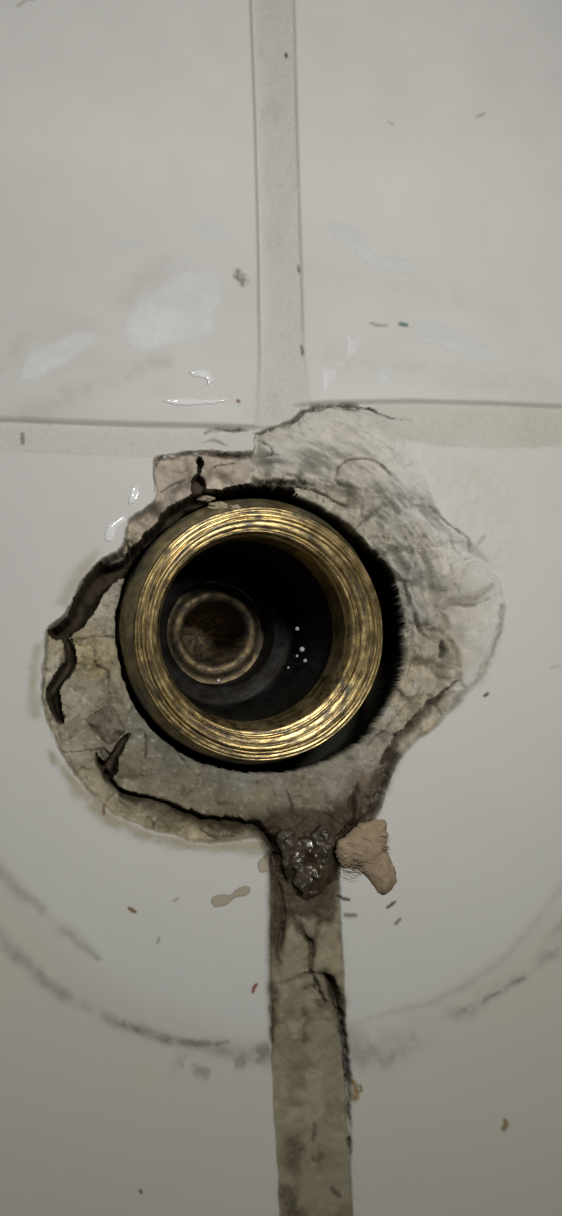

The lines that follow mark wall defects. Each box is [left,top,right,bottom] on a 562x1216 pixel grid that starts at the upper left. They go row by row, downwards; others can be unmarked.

crack [96,733,265,833]
crack [45,406,390,724]
spalling [39,401,509,877]
crack [337,1006,349,1106]